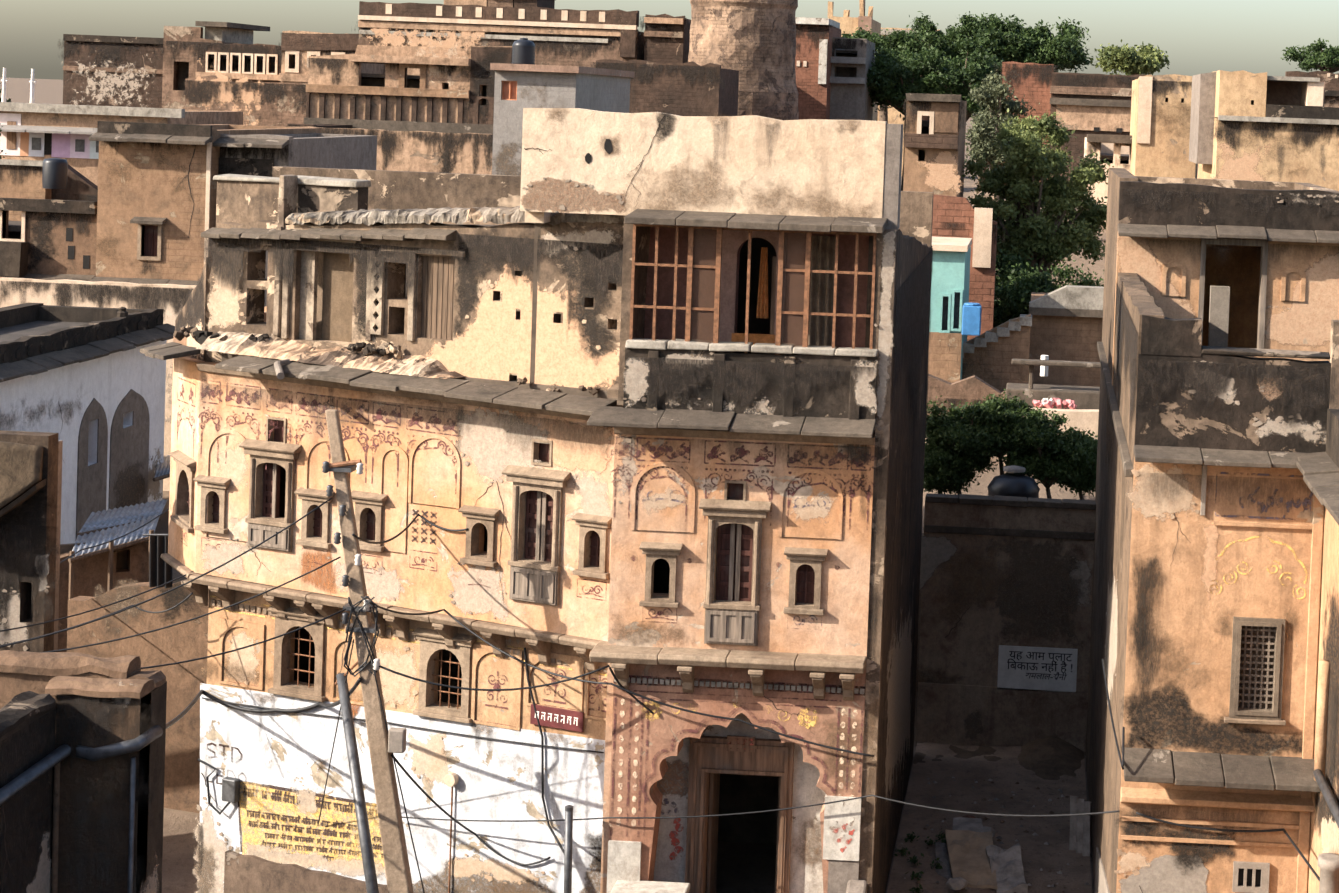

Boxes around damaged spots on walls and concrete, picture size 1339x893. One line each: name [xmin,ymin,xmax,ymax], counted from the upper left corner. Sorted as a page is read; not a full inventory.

flaking render [73,55,153,108]
water stain [59,16,722,176]
water stain [0,165,42,183]
crack [625,129,658,207]
water stain [0,194,623,361]
peeling [426,264,649,406]
peeling [667,352,714,366]
peeling [1216,379,1240,406]
peeling [1252,414,1326,443]
peeling [1264,253,1339,347]
water stain [1121,560,1303,756]
water stain [1315,594,1339,835]